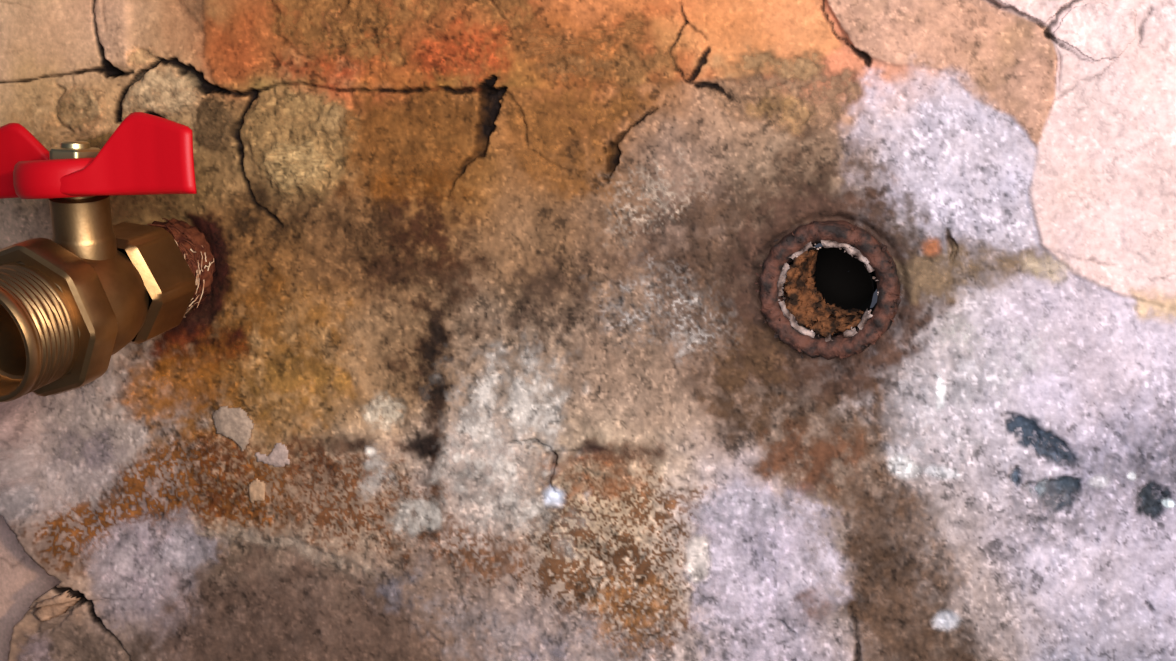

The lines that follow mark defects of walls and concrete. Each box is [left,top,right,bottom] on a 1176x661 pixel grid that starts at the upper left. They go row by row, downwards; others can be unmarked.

crack [669,7,731,99]
peeling [1000,0,1137,61]
spalling [123,49,357,196]
crack [0,0,527,226]
corrosion [123,214,248,414]
corrosion [782,249,864,338]
leakage [622,149,1042,661]
corrosion [35,433,707,661]
spalling [1006,413,1081,511]
leakage [1090,477,1107,486]
spalling [1138,482,1171,518]
crack [52,584,131,661]